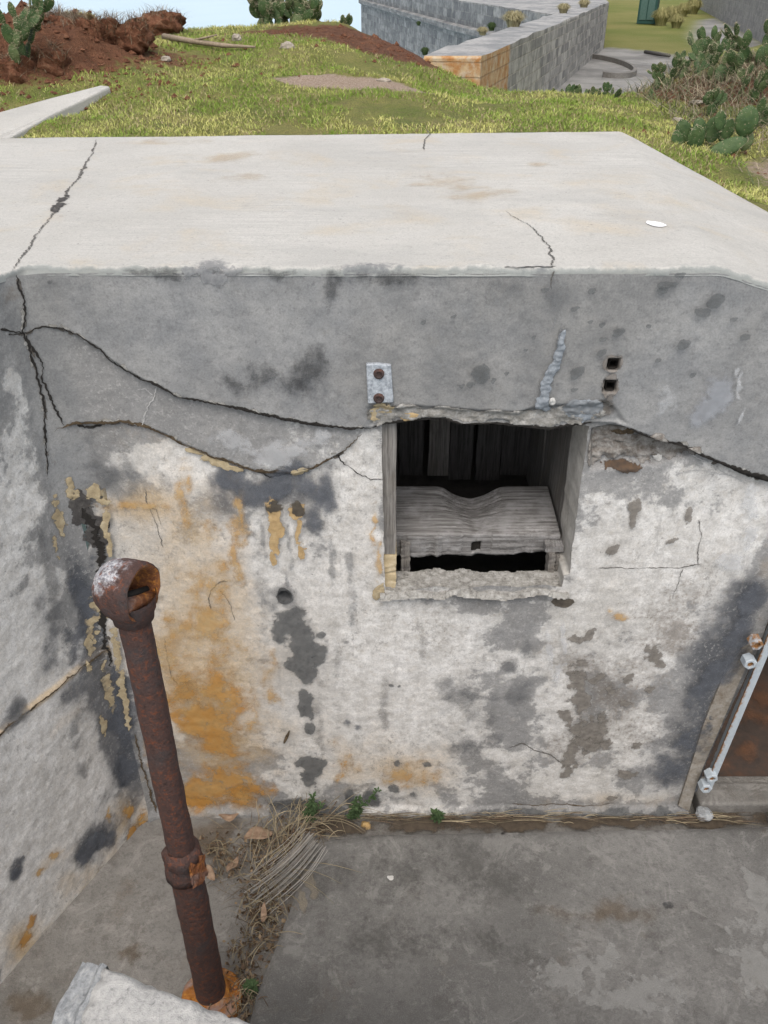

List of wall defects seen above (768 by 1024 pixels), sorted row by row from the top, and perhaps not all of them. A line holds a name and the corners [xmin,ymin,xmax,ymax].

crack [0,140,592,480]
spalling [51,477,113,559]
leakage [214,460,337,531]
spalling [367,399,701,474]
crack [630,428,768,483]
peeling [83,602,132,737]
corrosion [157,499,276,809]
leakage [271,607,328,735]
leakage [686,582,768,708]
leakage [76,829,116,866]
corrosion [124,806,147,840]
corrosion [189,854,209,889]